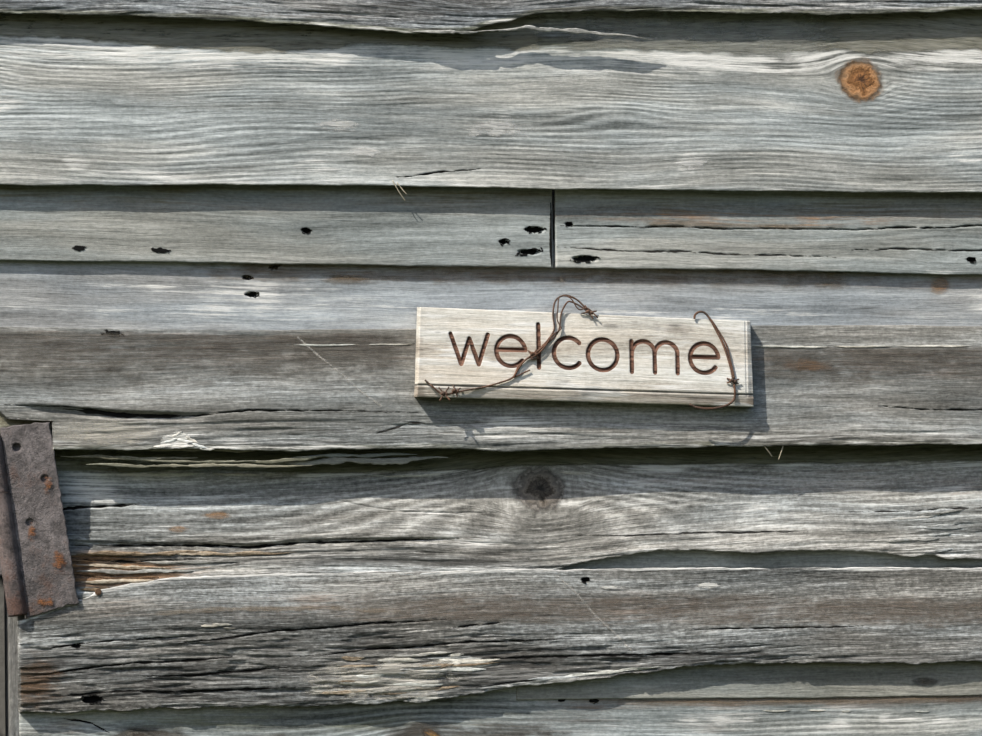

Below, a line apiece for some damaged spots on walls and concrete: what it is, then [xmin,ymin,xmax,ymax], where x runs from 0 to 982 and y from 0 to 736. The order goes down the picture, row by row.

crack [560,225,828,257]
crack [753,225,982,251]
crack [28,619,854,733]